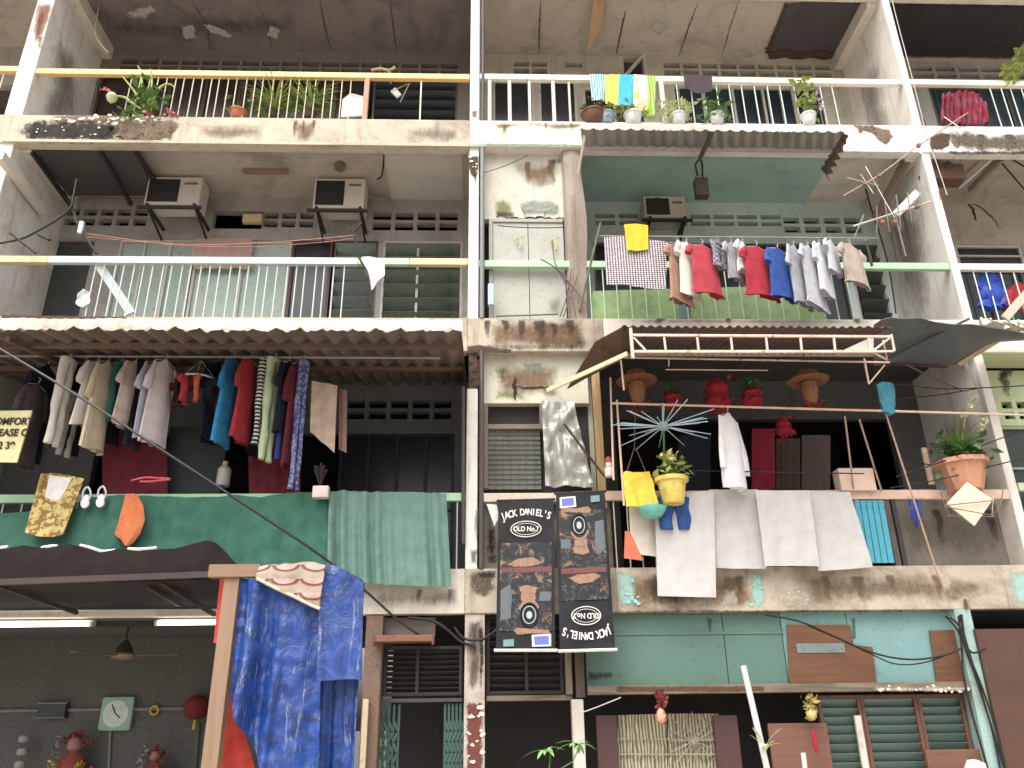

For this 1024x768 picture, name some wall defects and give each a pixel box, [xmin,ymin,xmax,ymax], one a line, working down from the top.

rust [35,5,50,39]
crack [679,3,698,56]
spalling [53,114,179,140]
rust [293,120,315,139]
spalling [854,125,893,144]
water stain [950,131,1024,155]
water stain [525,160,555,182]
crack [968,204,999,228]
water stain [485,320,584,349]
crack [512,377,549,400]
water stain [815,576,973,612]
peeling [466,703,485,768]